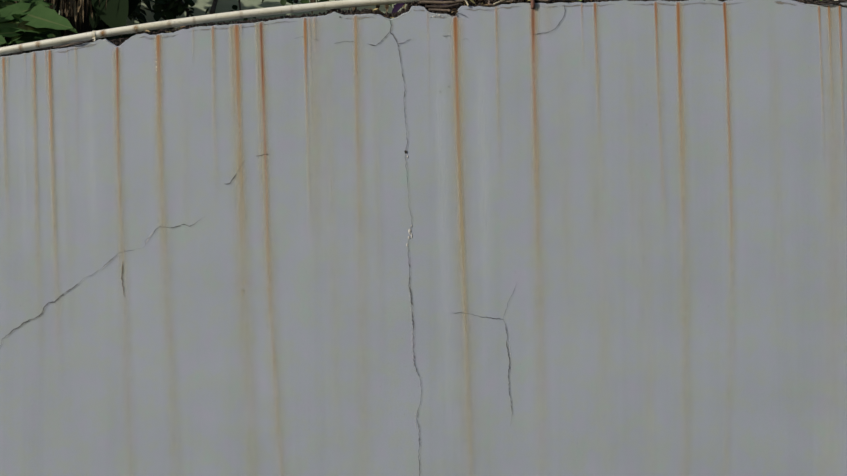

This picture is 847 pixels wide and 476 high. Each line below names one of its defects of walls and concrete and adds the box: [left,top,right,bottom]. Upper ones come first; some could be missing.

rust [231,24,241,127]
rust [257,22,269,262]
crack [347,21,411,183]
rust [452,16,464,253]
rust [676,2,685,142]
rust [723,2,731,155]
crack [9,216,206,334]
crack [406,208,414,328]
crack [458,312,513,421]